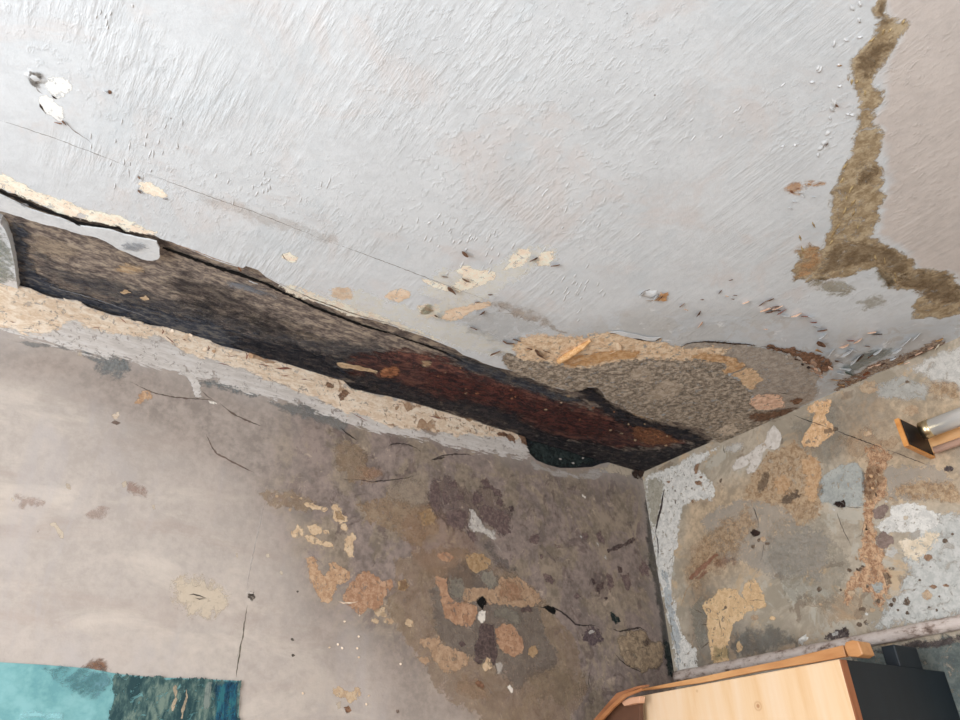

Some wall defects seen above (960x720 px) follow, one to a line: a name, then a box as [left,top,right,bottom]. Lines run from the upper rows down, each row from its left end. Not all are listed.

spalling [24,67,91,143]
damp [791,0,960,319]
crack [136,384,260,426]
crack [206,435,250,471]
spalling [0,173,960,693]
crack [236,605,248,677]
crack [540,607,647,632]
damp [663,641,673,677]
damp [824,627,850,640]
damp [853,646,886,665]
damp [901,634,960,717]